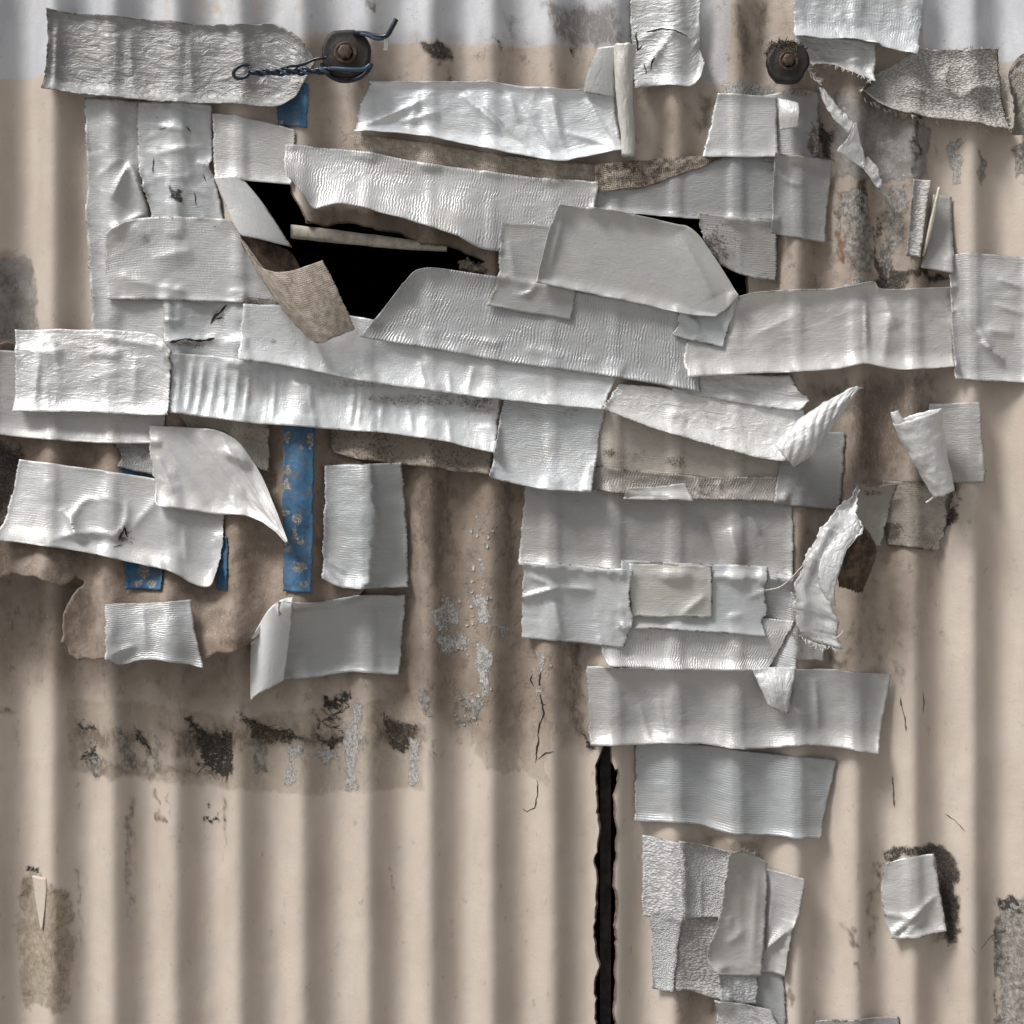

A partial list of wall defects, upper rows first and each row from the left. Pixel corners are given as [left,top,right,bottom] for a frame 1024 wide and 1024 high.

damp [819,124,834,161]
damp [875,244,893,287]
damp [280,719,343,750]
crack [523,672,554,812]
damp [942,870,957,941]